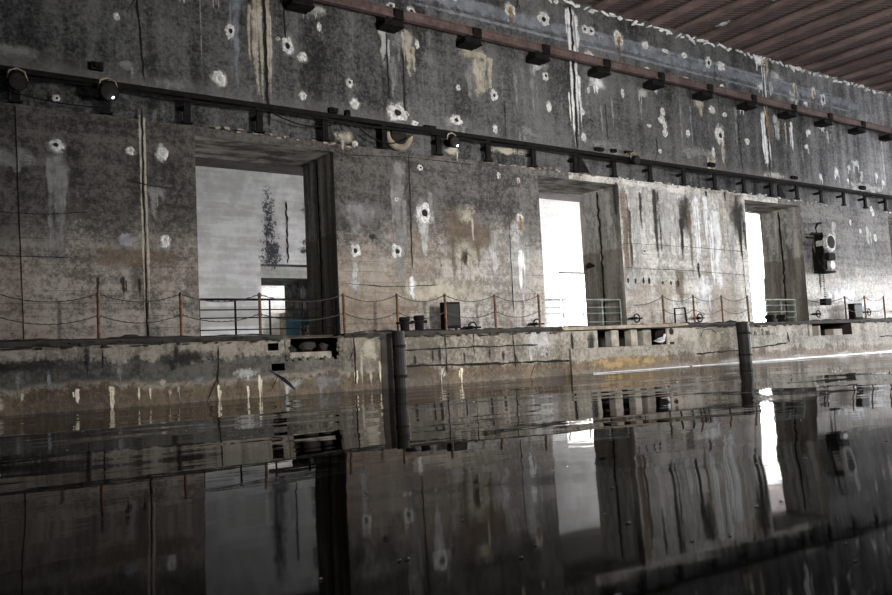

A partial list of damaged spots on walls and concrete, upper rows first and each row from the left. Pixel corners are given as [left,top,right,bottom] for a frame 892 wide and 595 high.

water stain [212,0,272,91]
spalling [276,37,307,62]
water stain [377,30,416,96]
water stain [419,0,866,113]
spalling [549,0,890,96]
water stain [0,150,32,172]
spalling [387,102,419,126]
spalling [646,108,668,137]
spalling [708,105,727,158]
water stain [46,156,67,254]
spalling [415,202,434,225]
water stain [581,182,747,311]